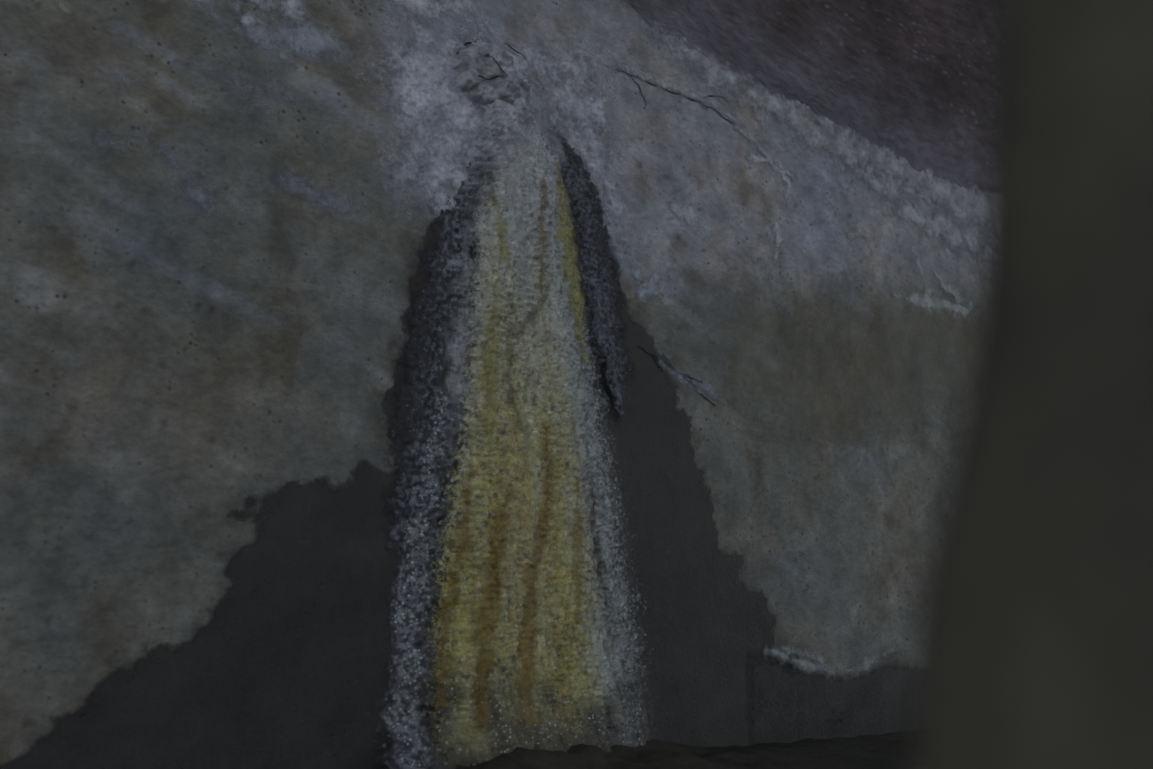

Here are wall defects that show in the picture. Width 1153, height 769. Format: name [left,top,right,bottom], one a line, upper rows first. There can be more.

crack [603,63,763,152]
damp [619,22,989,262]
damp [0,0,916,769]
damp [894,257,972,315]